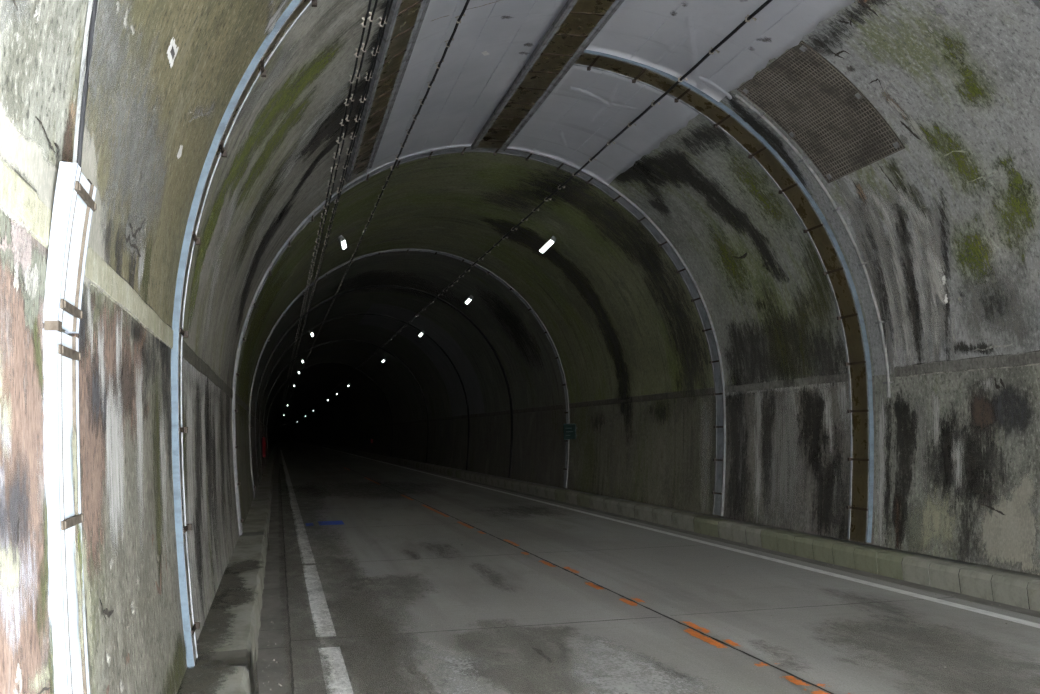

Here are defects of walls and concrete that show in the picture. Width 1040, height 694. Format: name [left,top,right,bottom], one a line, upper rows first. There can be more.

crack [0,0,28,32]
crack [35,116,59,158]
leakage [78,0,388,694]
leakage [615,124,849,538]
leakage [838,178,956,376]
leakage [0,373,55,694]
leakage [877,379,1040,574]